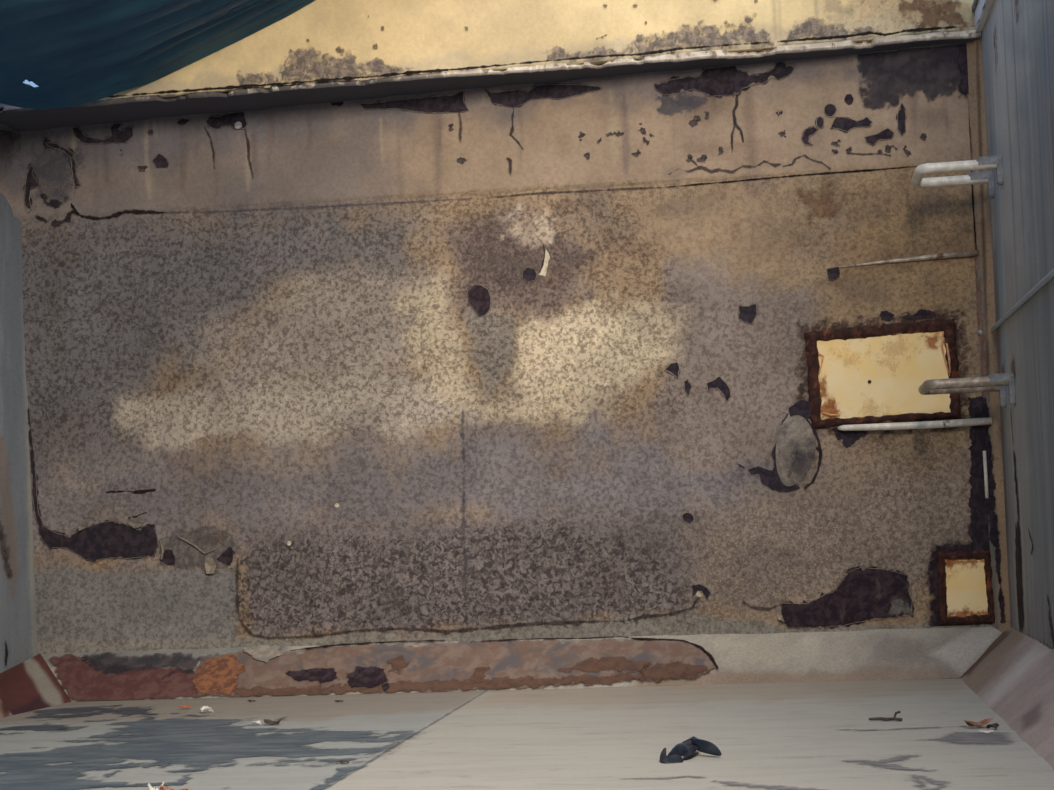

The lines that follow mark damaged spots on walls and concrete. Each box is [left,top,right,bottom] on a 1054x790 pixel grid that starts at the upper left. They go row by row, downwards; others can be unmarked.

peeling [548,16,873,62]
spalling [632,123,654,157]
crack [497,153,917,198]
spalling [654,61,796,163]
peeling [801,94,911,157]
crack [968,107,977,250]
rust [795,256,989,437]
peeling [27,409,159,563]
rust [49,522,719,701]
peeling [776,566,914,629]
rust [926,543,993,626]